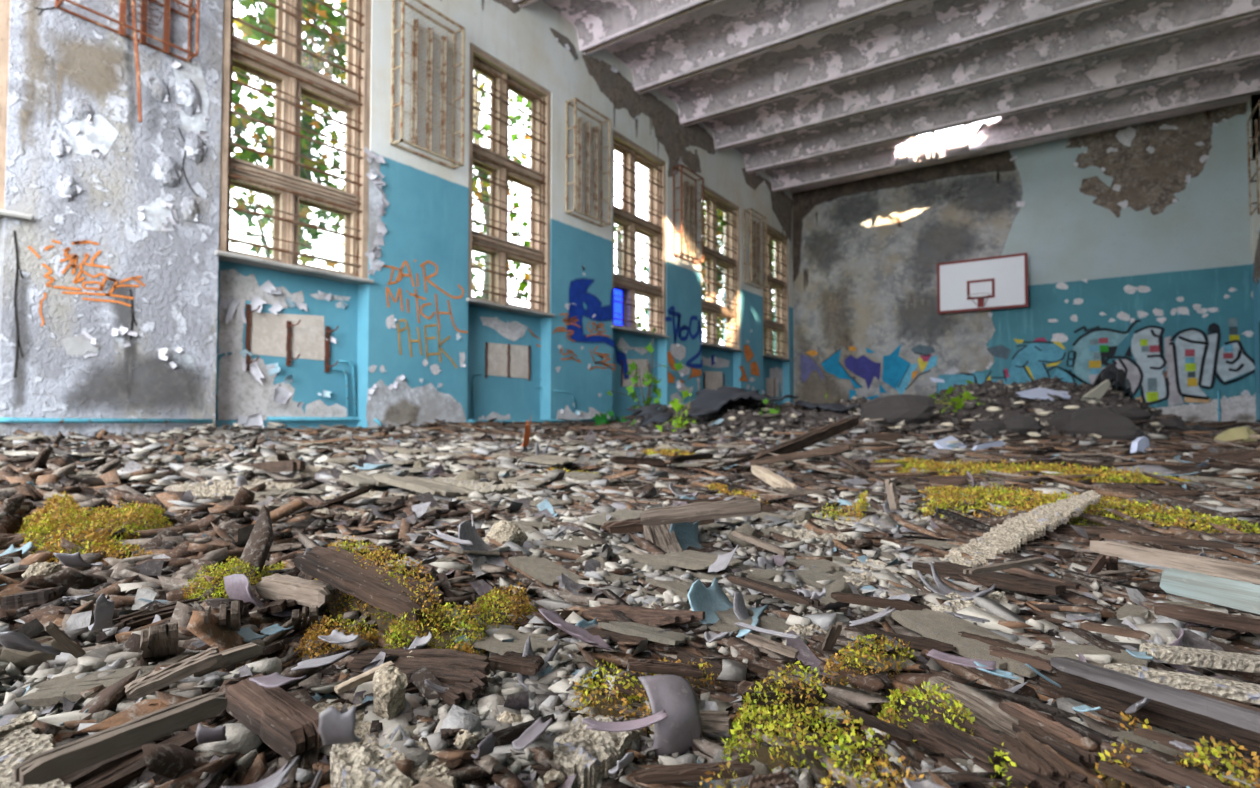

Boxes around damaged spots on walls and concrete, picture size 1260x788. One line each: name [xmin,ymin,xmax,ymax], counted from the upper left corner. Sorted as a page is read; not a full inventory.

peeling [65,114,119,159]
corrosion [126,41,136,129]
peeling [170,60,210,143]
peeling [137,199,178,233]
peeling [364,146,390,275]
flaking render [550,0,1260,404]
peeling [62,326,140,358]
peeling [157,346,197,371]
peeling [218,269,351,427]
peeling [480,317,529,379]
flaking render [366,359,511,453]
peeling [417,463,445,476]